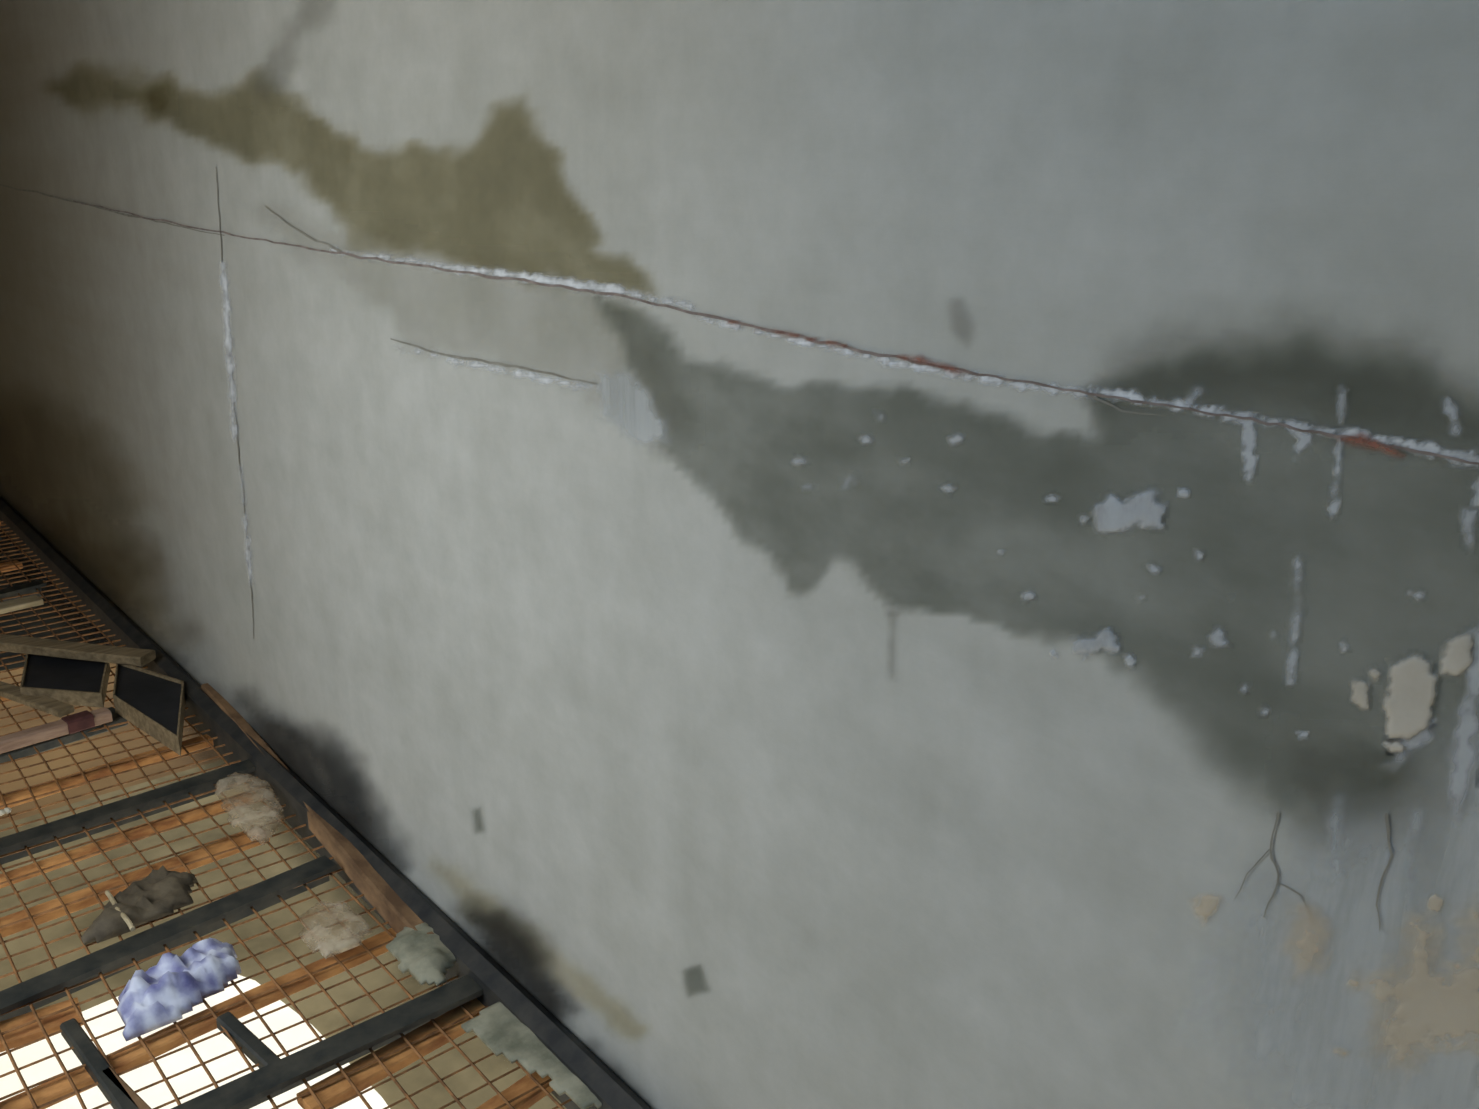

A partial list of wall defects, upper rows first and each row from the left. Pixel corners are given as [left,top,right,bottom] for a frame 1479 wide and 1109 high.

crack [0,175,1479,639]
peeling [1083,492,1164,532]
peeling [1195,630,1226,655]
crack [1288,616,1299,683]
peeling [1352,634,1473,751]
leakage [1450,633,1479,805]